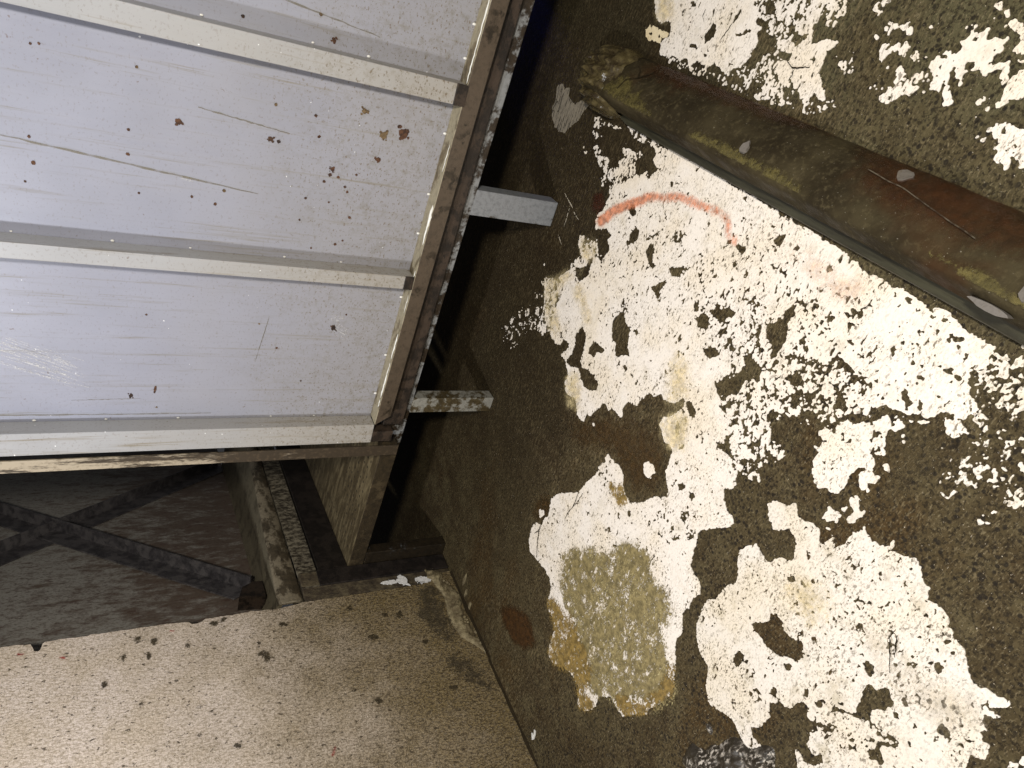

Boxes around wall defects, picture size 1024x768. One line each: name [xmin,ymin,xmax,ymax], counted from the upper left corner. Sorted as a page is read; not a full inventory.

peeling [646,0,854,115]
peeling [869,0,1024,118]
corrosion [4,135,253,193]
corrosion [198,107,290,144]
corrosion [379,125,409,141]
corrosion [593,193,719,225]
peeling [503,84,1024,768]
damp [547,543,677,716]